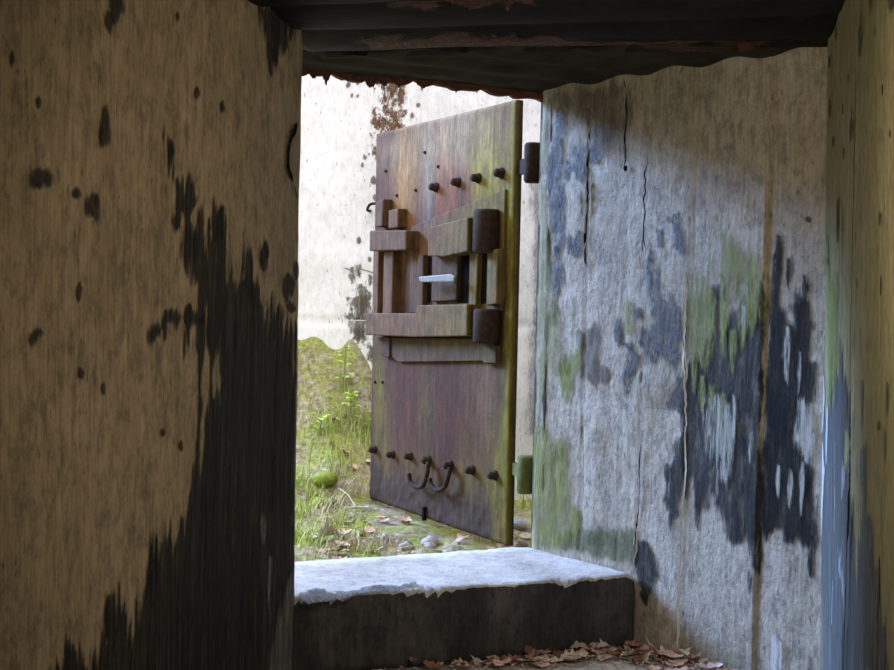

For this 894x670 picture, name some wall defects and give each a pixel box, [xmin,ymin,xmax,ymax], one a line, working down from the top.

water stain [528,111,608,435]
crack [623,80,648,260]
water stain [634,540,657,606]
water stain [663,235,887,670]